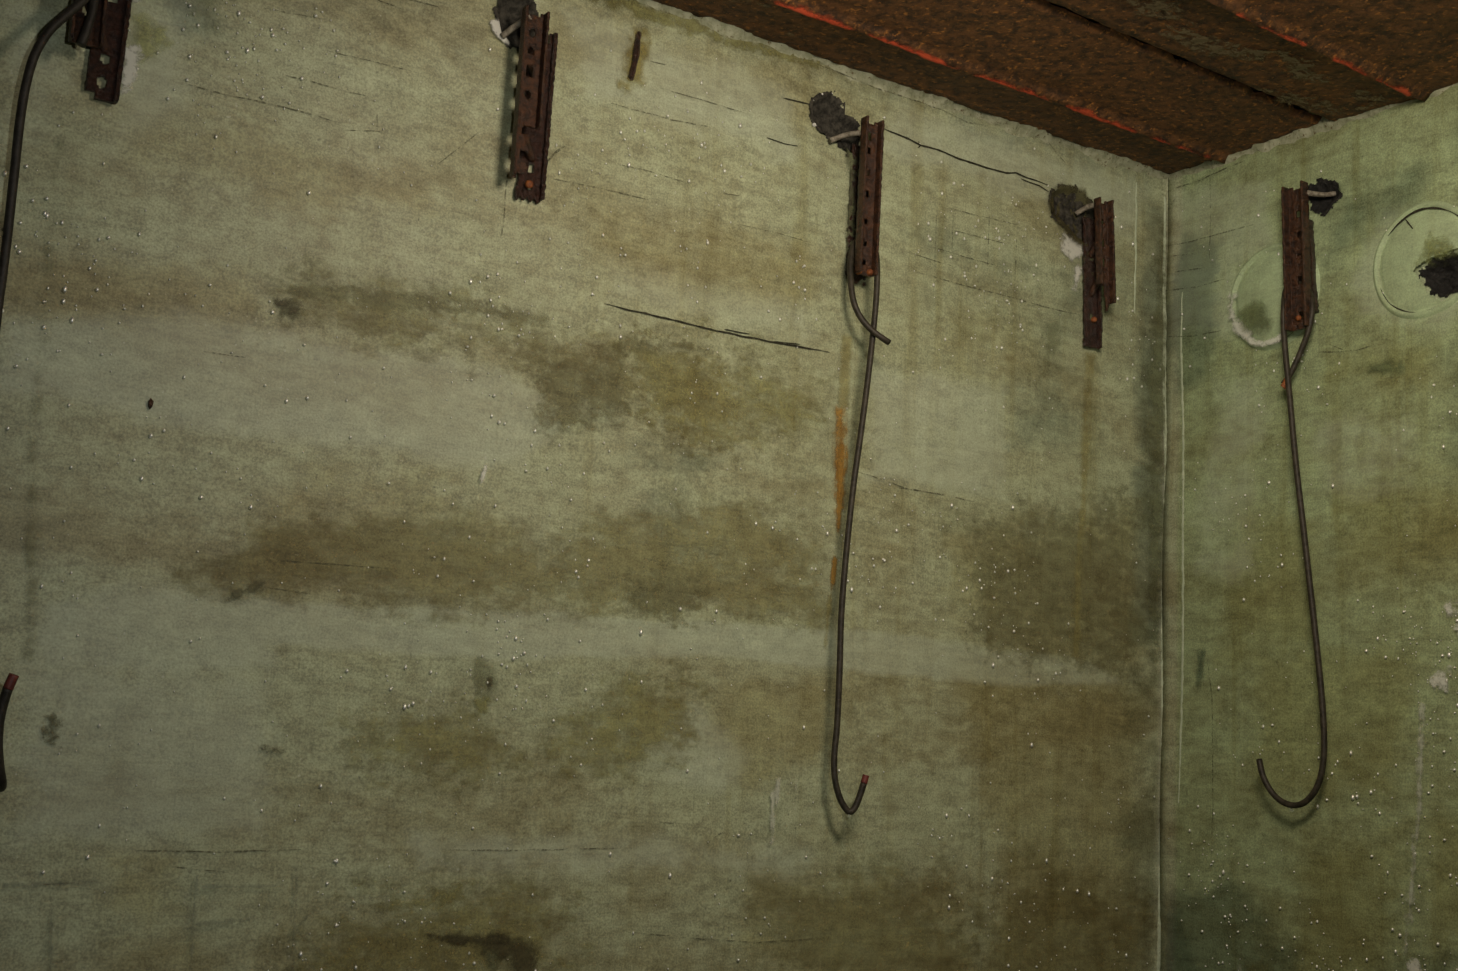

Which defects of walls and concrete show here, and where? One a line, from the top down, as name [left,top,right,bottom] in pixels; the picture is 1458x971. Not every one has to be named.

rust [619,28,650,89]
rust [845,203,866,286]
damp [280,269,826,441]
crack [604,303,828,352]
rust [835,407,848,530]
damp [177,505,828,627]
damp [296,882,550,971]